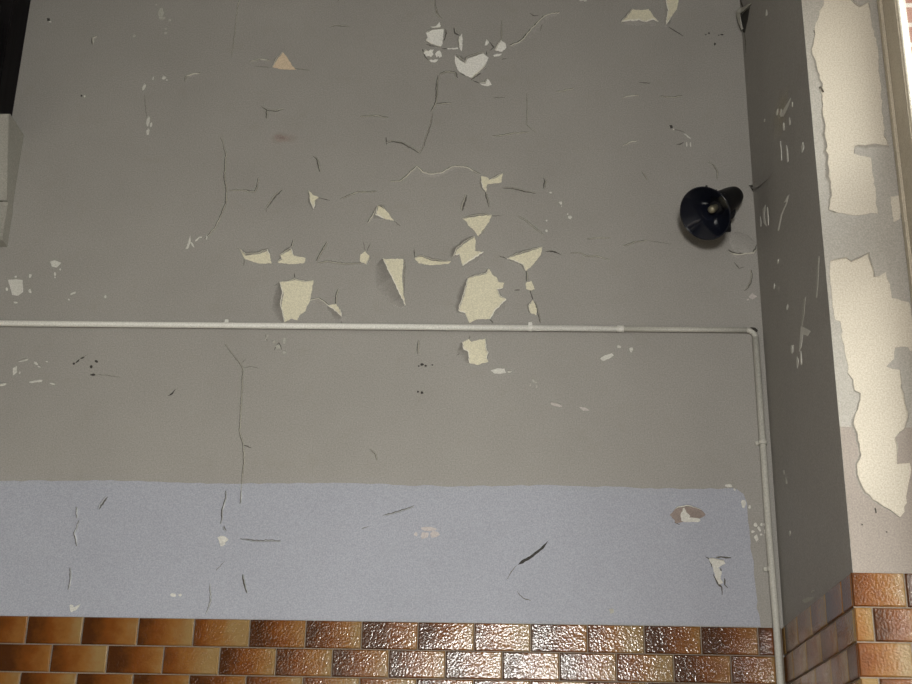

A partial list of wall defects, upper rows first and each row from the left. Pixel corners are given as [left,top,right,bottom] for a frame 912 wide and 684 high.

peeling [422,8,506,86]
peeling [621,0,683,36]
crack [206,137,282,238]
crack [342,75,481,199]
crack [503,177,547,193]
peeling [810,0,889,216]
peeling [237,240,346,323]
peeling [318,173,508,323]
peeling [500,246,542,321]
peeling [457,336,512,374]
peeling [830,252,912,517]
crack [206,343,281,614]